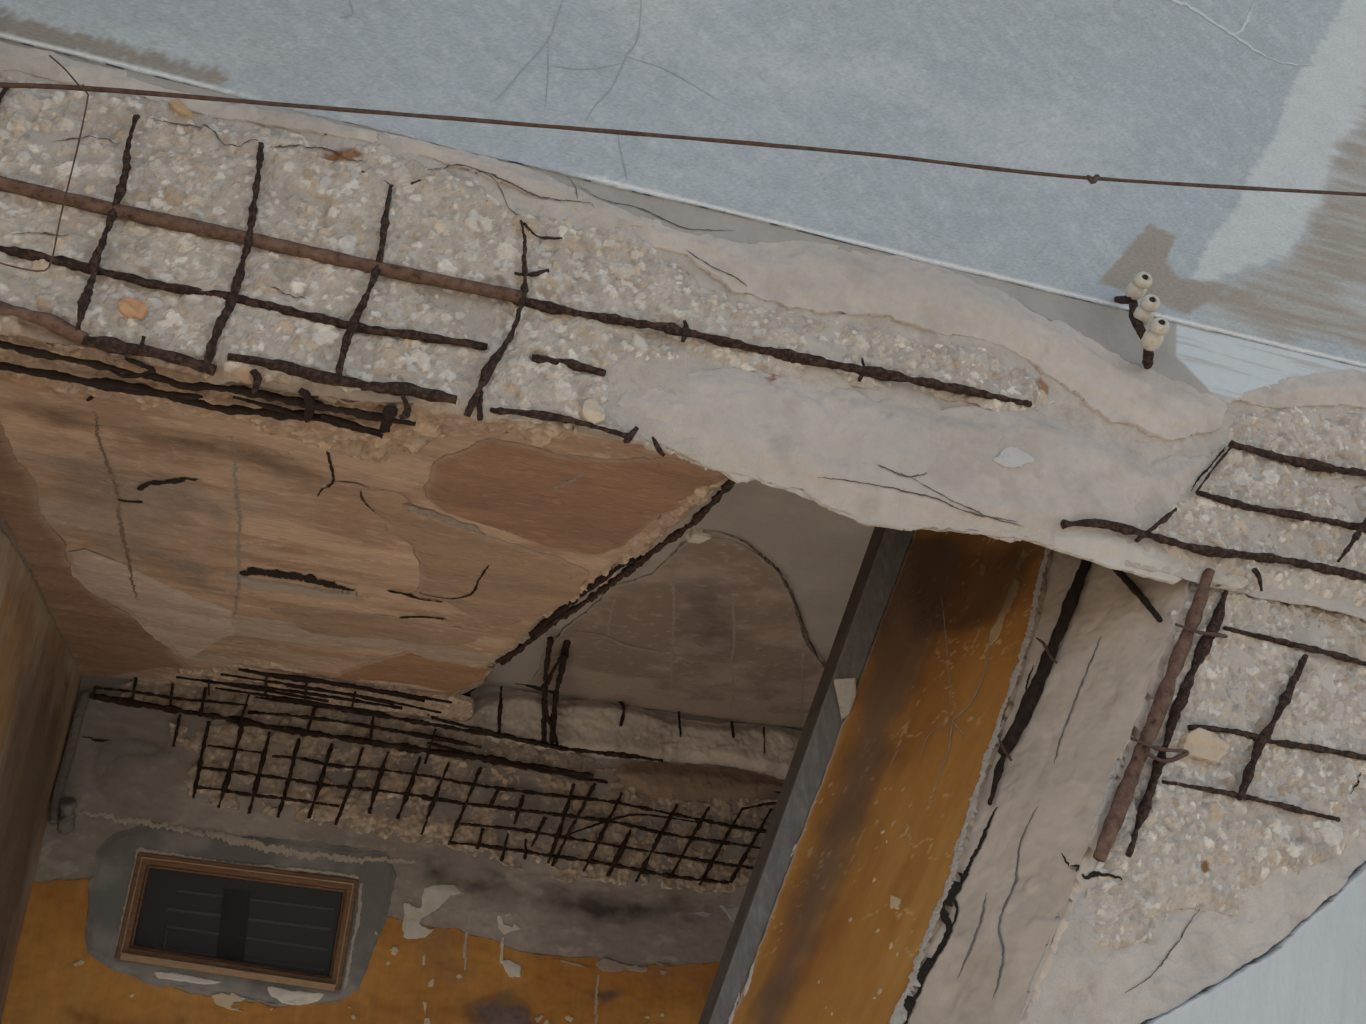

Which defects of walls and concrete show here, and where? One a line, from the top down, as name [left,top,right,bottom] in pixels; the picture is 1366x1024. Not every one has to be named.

rust [326,151,359,161]
crack [428,135,747,287]
crack [117,477,199,503]
crack [317,451,489,620]
spalling [0,76,1056,922]
crack [240,567,354,591]
spalling [1085,406,1366,950]
peeling [386,884,464,965]
peeling [497,913,521,977]
crack [904,807,1038,1024]
peeling [154,972,248,1012]
peeling [268,986,324,1011]